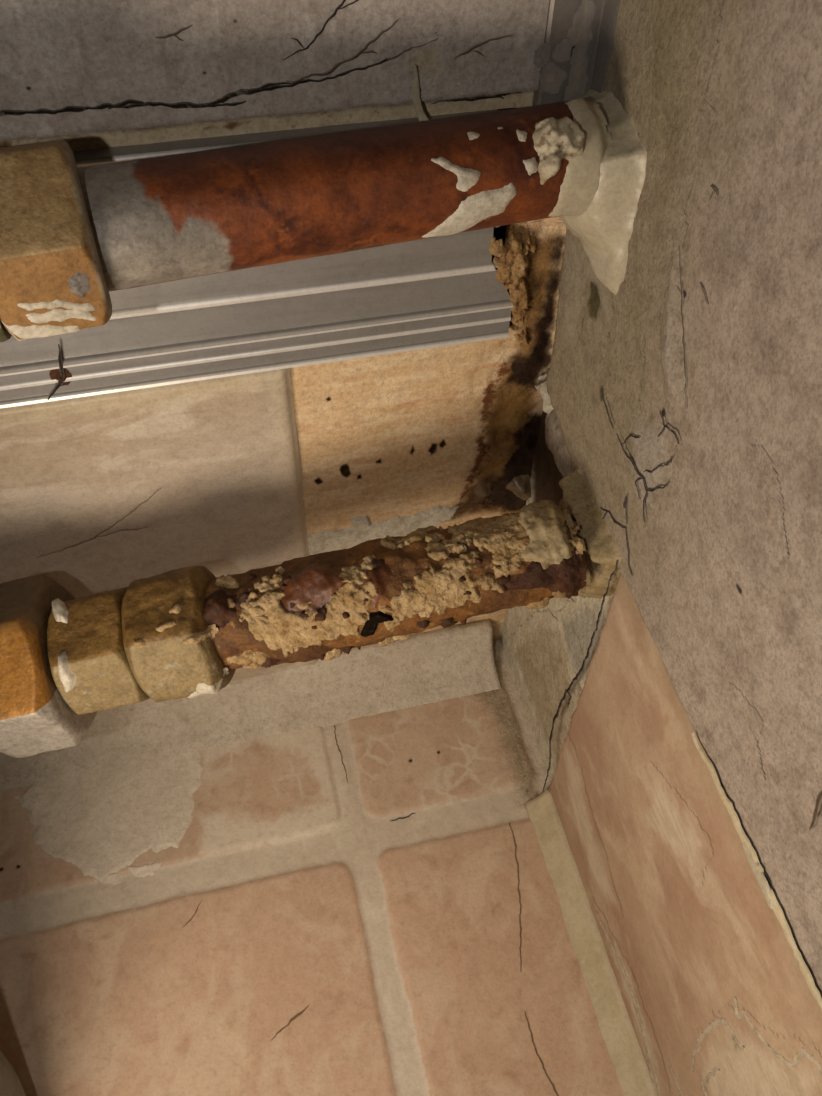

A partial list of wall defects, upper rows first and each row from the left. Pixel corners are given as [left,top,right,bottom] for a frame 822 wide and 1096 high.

crack [0,0,523,117]
leakage [441,220,566,524]
flaking render [535,374,574,478]
crack [542,246,709,793]
crack [509,824,522,972]
crack [525,1014,558,1096]